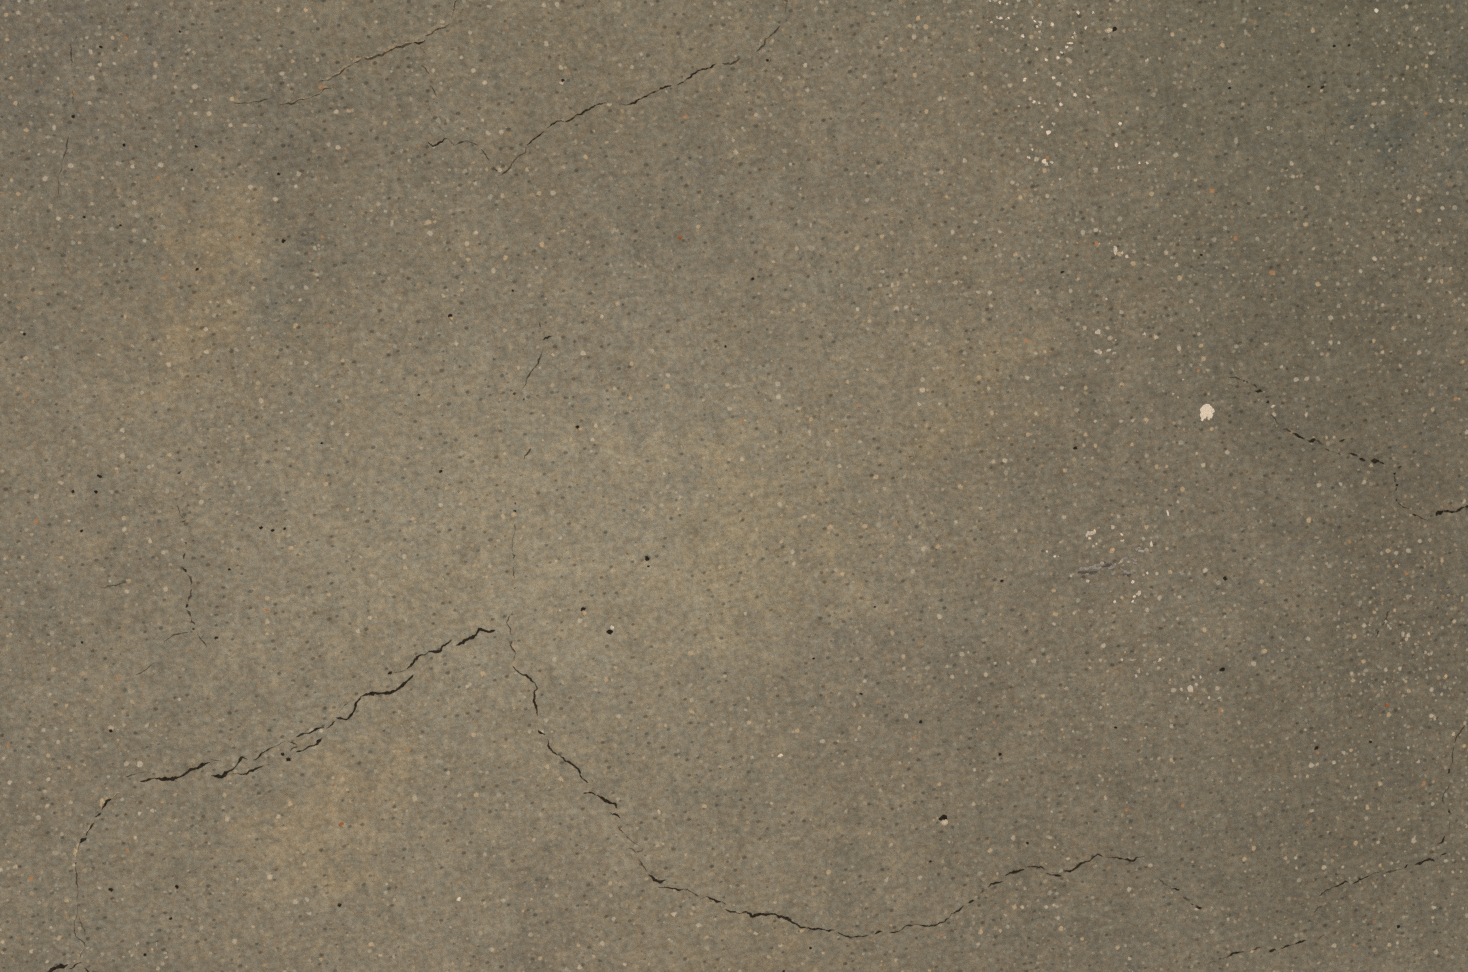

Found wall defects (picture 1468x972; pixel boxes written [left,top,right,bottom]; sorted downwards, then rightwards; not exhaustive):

crack [237,0,788,187]
crack [513,324,551,400]
crack [1230,376,1468,519]
crack [48,448,1202,972]
crack [1209,724,1468,964]